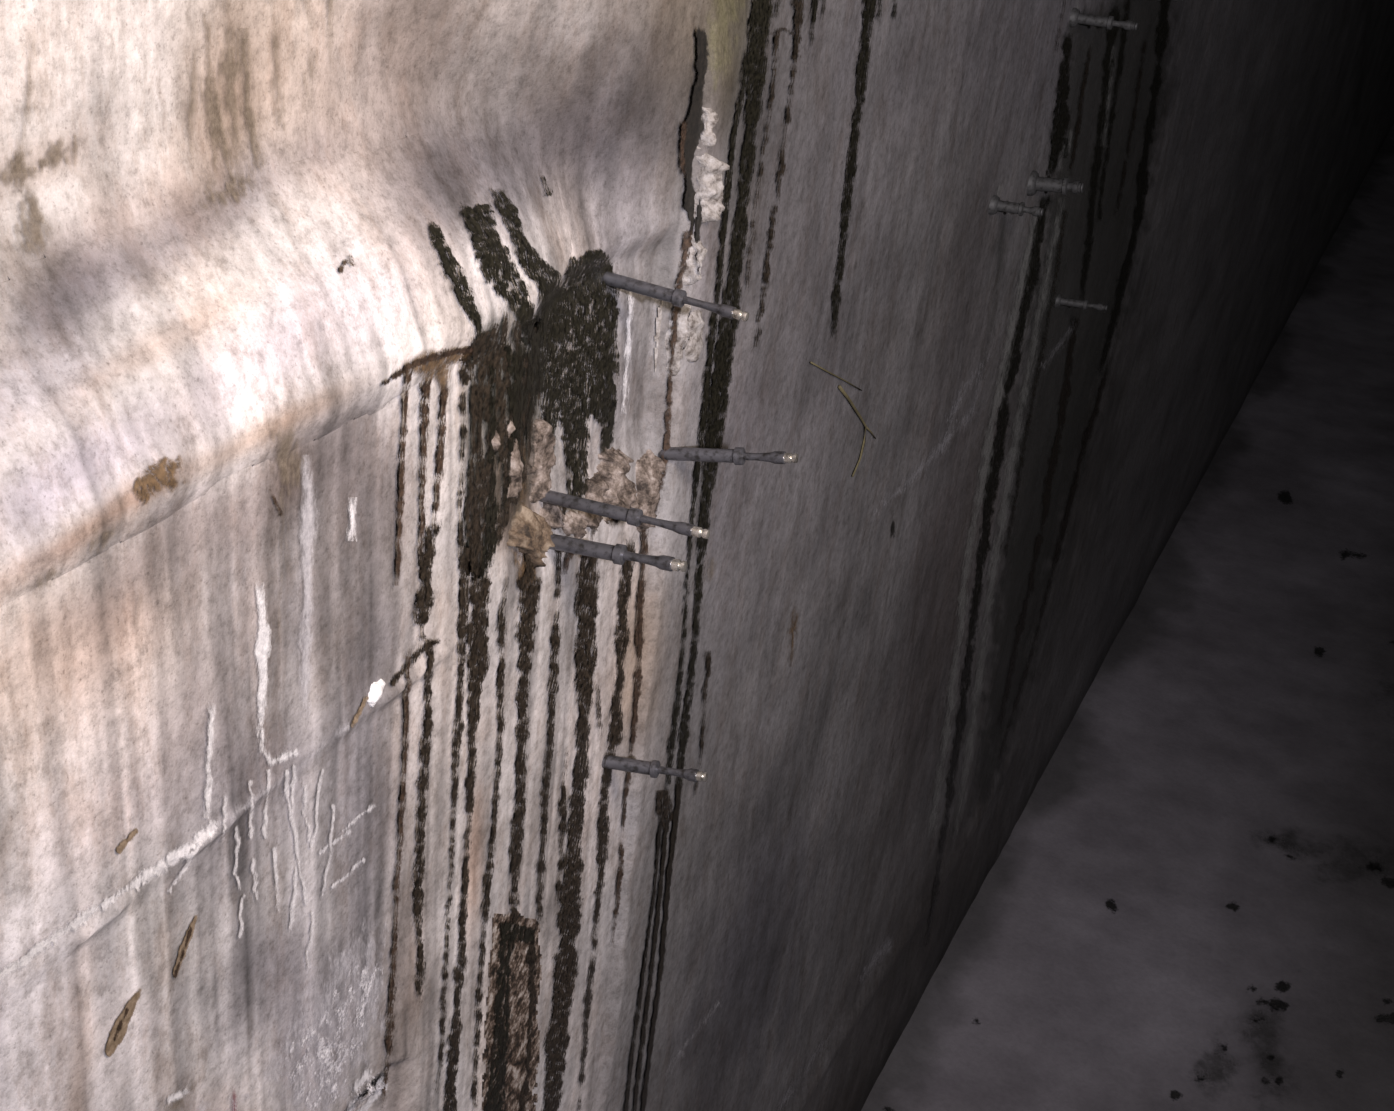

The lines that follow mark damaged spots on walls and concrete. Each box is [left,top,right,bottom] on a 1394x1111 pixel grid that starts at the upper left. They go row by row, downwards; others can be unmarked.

rust [134,456,186,504]
water stain [382,188,648,1111]
spalling [485,408,666,596]
spalling [654,300,705,376]
spalling [678,107,730,285]
water stain [624,0,826,1111]
water stain [831,0,897,337]
water stain [925,0,1171,945]